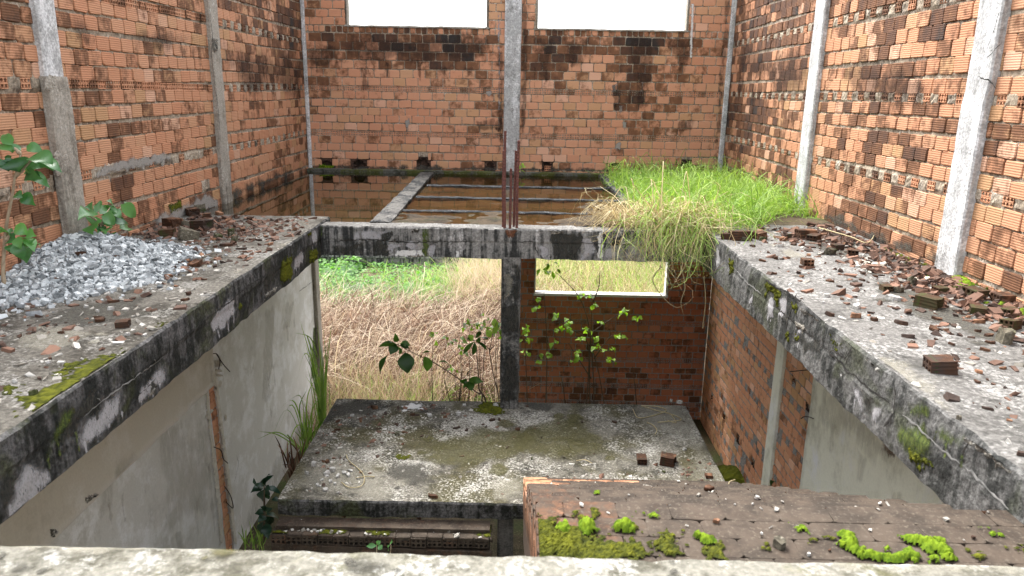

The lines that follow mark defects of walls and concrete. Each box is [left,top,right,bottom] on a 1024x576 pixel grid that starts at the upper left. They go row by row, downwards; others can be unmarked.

damp [330,229,436,257]
damp [539,232,645,261]
damp [42,289,151,327]
damp [211,300,235,338]
damp [767,297,820,355]
damp [865,271,996,345]
damp [138,371,165,405]
damp [854,389,882,422]
crack [735,269,1009,510]
damp [898,405,954,458]
damp [0,392,123,516]
damp [388,464,434,489]